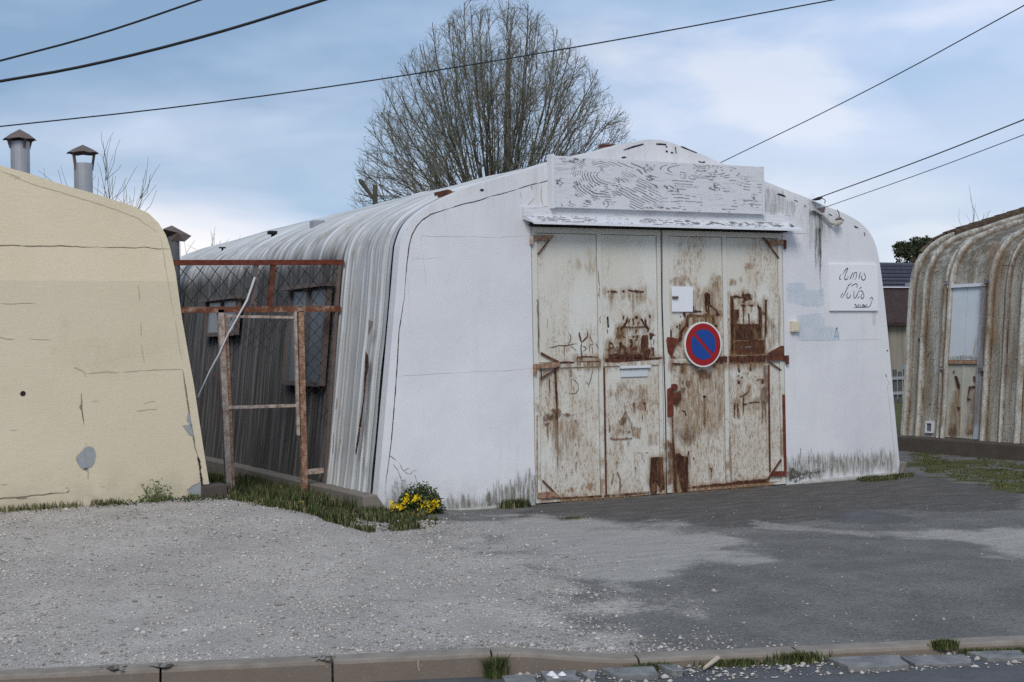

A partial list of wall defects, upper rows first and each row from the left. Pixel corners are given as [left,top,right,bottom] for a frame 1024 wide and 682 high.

peeling [536,143,794,227]
crack [0,171,198,456]
rust [539,280,780,502]
rust [949,379,980,439]
spalling [76,447,96,471]
damp [789,451,892,482]